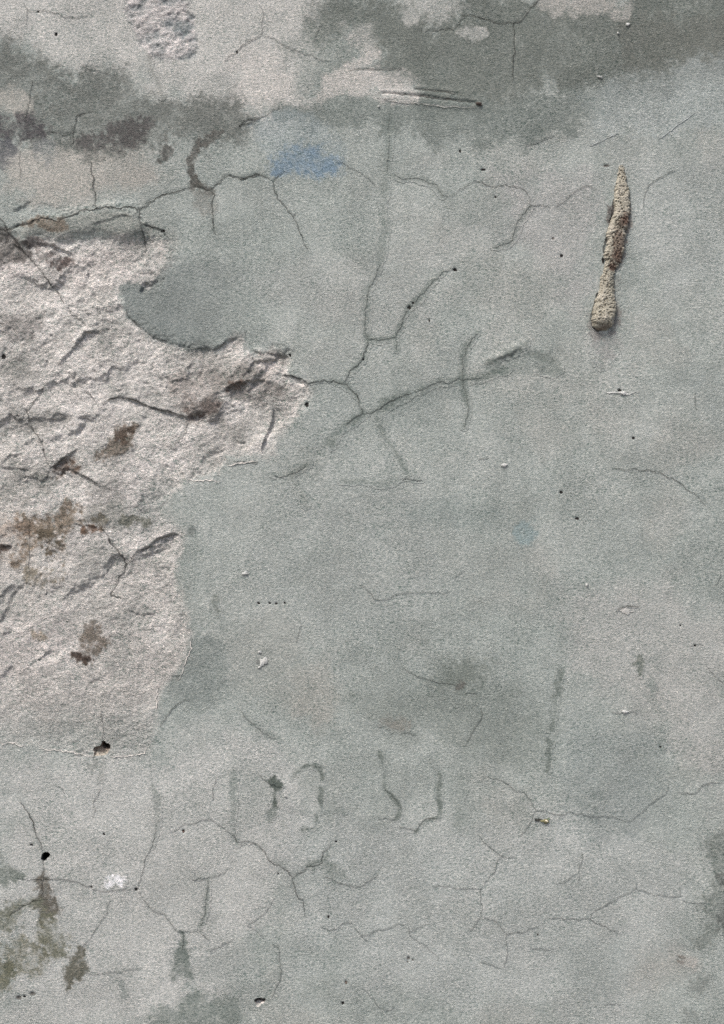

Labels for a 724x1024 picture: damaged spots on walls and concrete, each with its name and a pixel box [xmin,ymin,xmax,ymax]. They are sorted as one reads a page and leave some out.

crack [0,163,307,344]
leakage [0,0,724,490]
crack [339,114,597,247]
crack [26,385,96,483]
crack [68,372,188,445]
spalling [0,237,311,760]
crack [282,265,476,425]
crack [487,776,724,835]
leakage [0,850,91,1000]
crack [13,779,435,994]
crack [432,838,706,965]